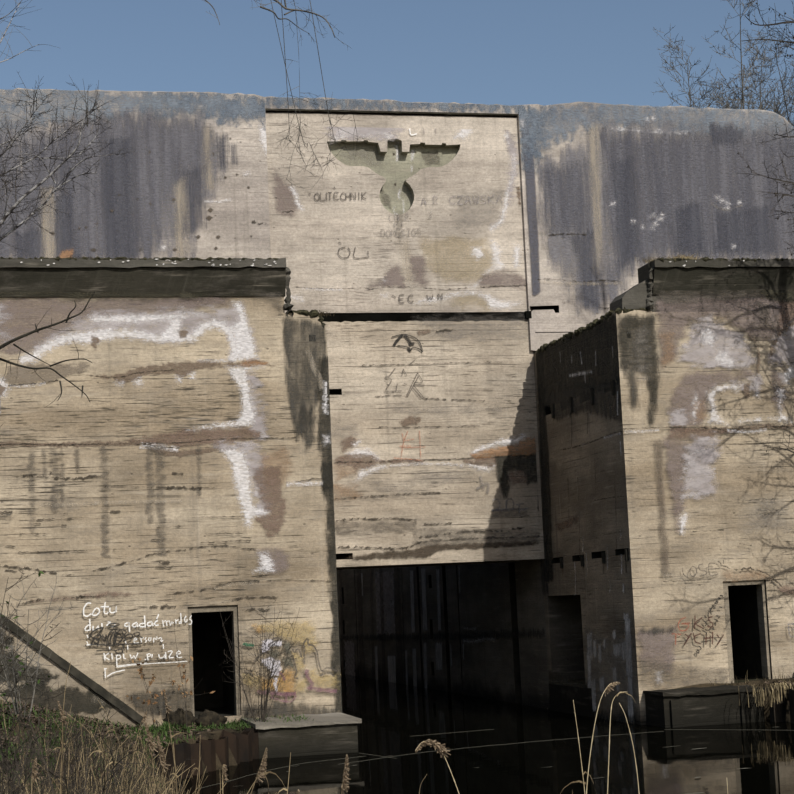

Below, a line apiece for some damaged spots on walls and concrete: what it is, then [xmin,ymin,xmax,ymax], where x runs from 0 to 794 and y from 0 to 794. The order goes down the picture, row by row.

water stain [129,689,191,716]
water stain [245,293,544,717]
water stain [0,89,794,594]
water stain [549,615,729,724]